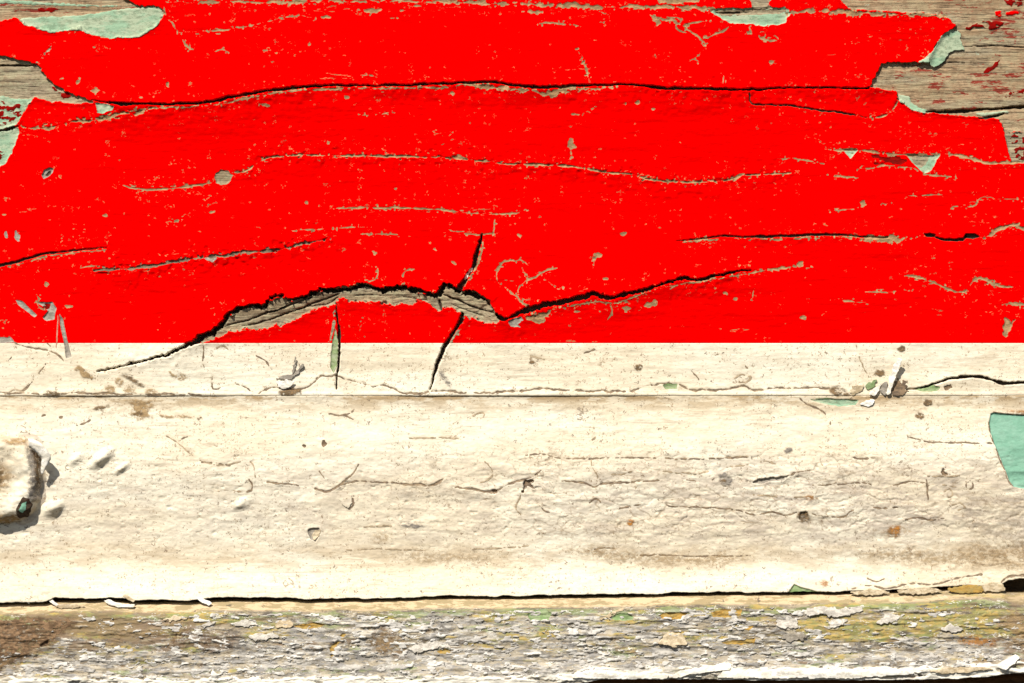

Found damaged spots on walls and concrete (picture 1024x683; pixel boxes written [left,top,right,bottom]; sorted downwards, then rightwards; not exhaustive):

crack [20,47,898,131]
peeling [0,0,1024,179]
crack [677,222,1024,244]
crack [0,235,831,426]
crack [906,375,1024,390]
peeling [988,411,1024,489]
peeling [16,497,33,518]
peeling [0,582,1024,683]